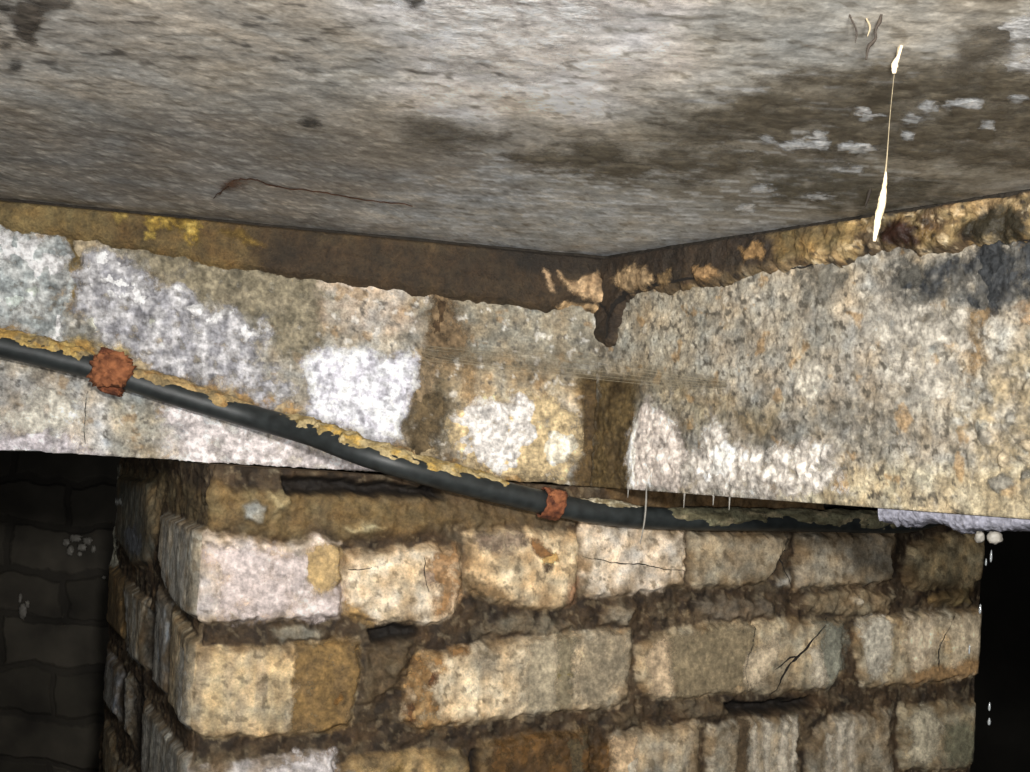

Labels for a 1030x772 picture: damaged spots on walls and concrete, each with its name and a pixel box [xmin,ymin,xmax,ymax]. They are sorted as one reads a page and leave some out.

leakage [0,0,72,47]
leakage [399,0,609,71]
leakage [299,118,319,128]
leakage [505,17,1030,214]
flaking render [543,265,671,314]
flaking render [692,265,718,283]
flaking render [741,241,765,260]
leakage [859,204,1030,400]
crack [745,617,827,693]